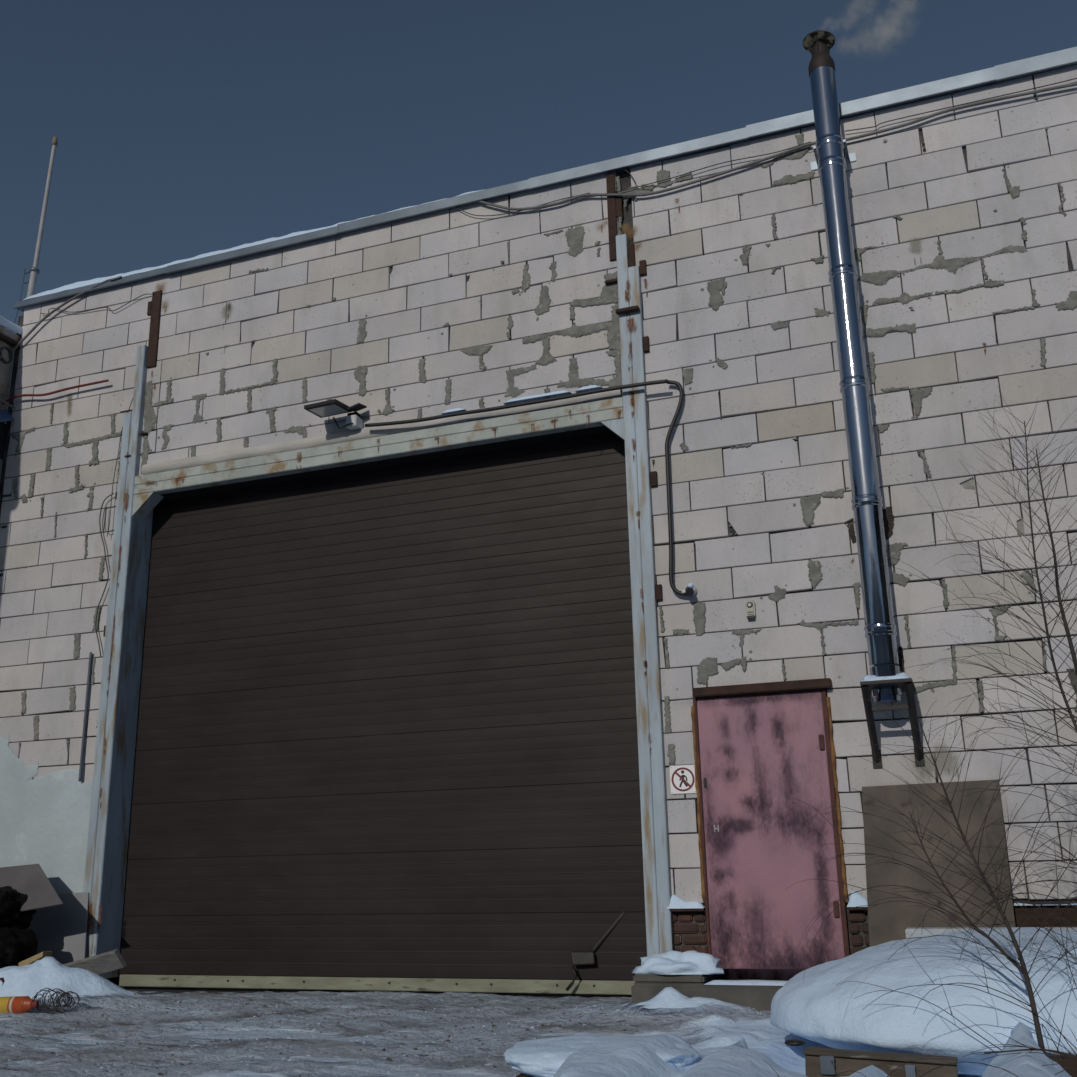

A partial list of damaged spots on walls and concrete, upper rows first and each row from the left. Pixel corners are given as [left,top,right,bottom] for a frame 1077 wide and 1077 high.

rust [625,280,636,370]